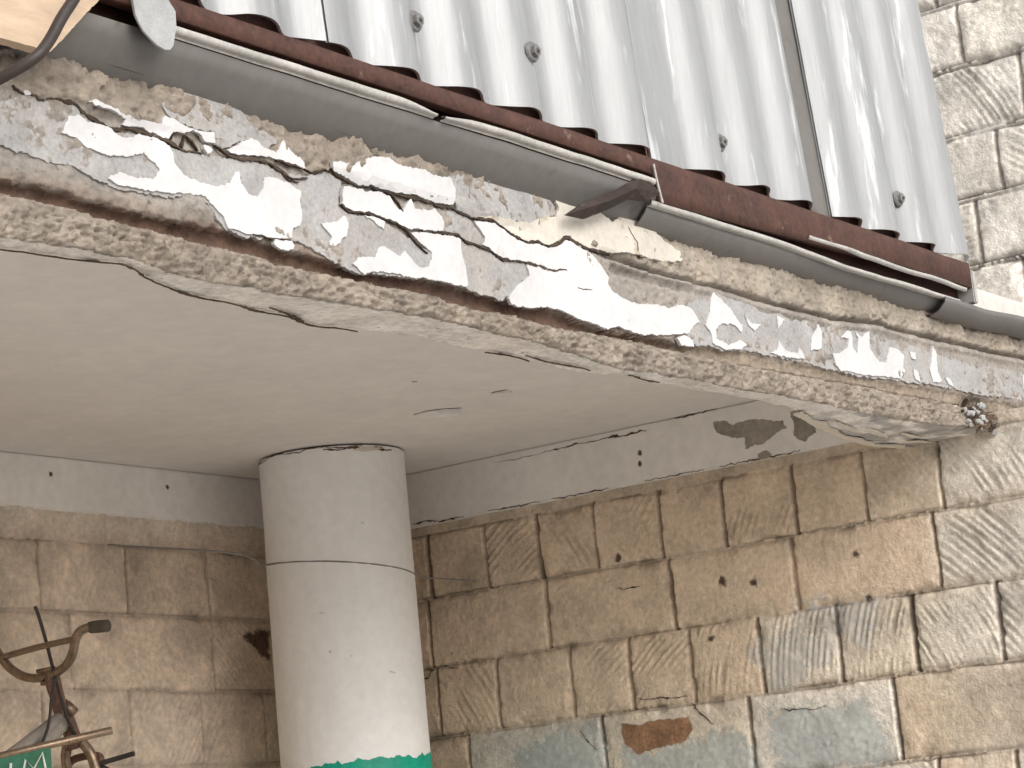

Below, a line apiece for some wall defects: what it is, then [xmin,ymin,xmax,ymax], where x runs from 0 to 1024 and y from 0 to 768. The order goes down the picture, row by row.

crack [12,85,610,290]
crack [0,249,358,332]
corrosion [0,179,670,350]
flaking render [0,90,1024,437]
crack [499,430,646,462]
peeling [713,411,816,460]
water stain [244,629,270,660]